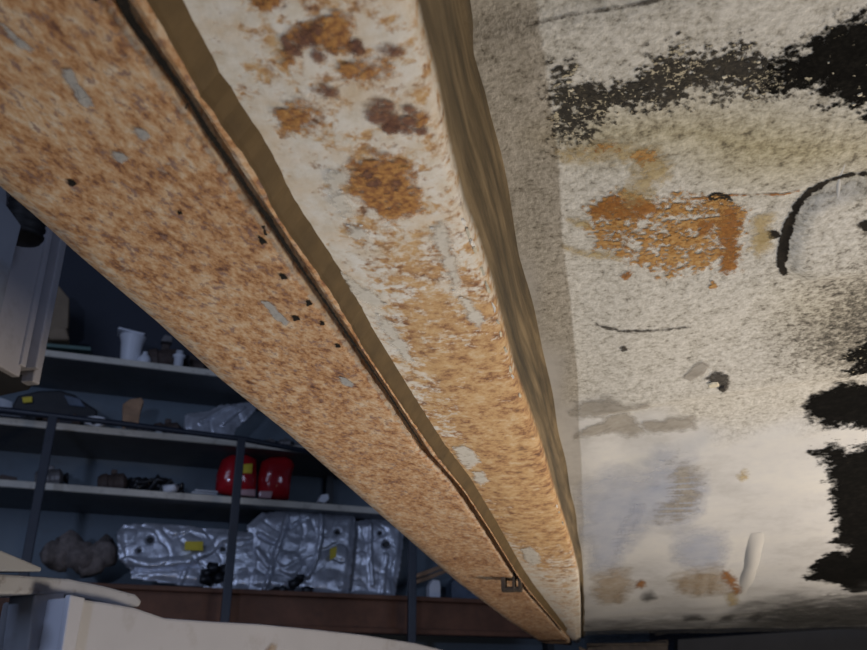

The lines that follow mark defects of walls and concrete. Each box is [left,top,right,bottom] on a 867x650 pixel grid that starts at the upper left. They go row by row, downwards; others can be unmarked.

rust [280,11,404,86]
crack [526,0,661,27]
rust [273,100,322,134]
rust [312,86,339,99]
rust [366,98,430,135]
rust [347,150,426,223]
rust [558,144,772,280]
crack [681,172,867,276]